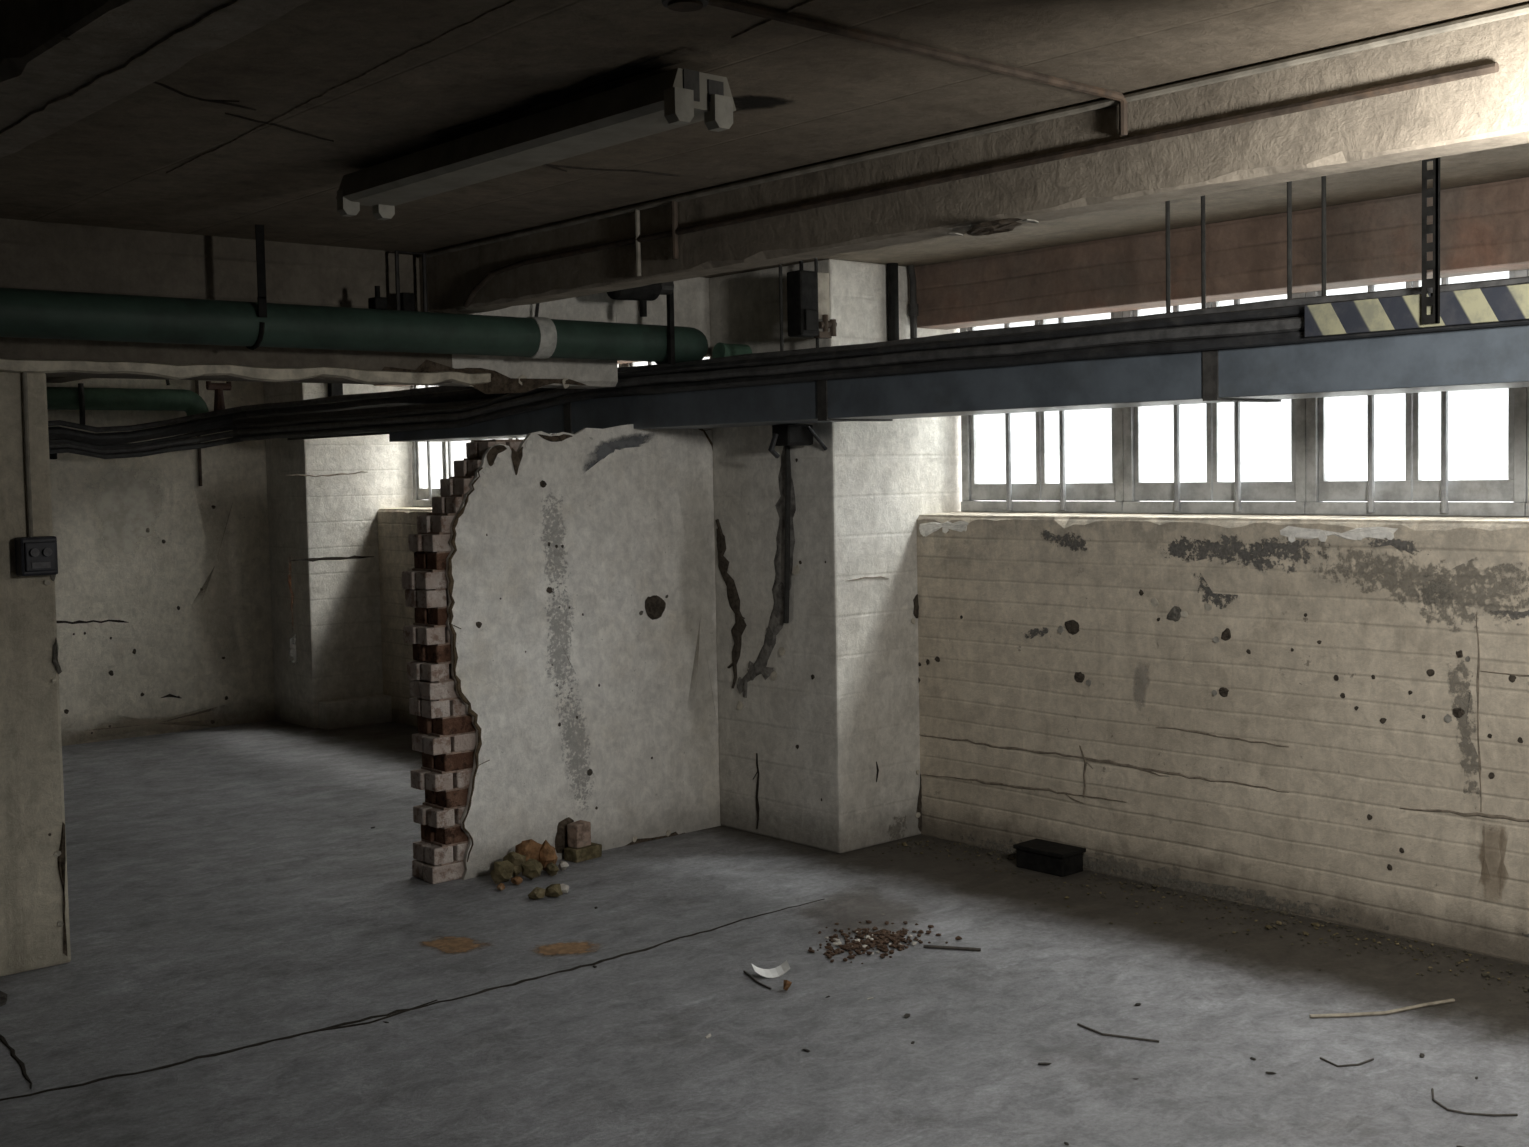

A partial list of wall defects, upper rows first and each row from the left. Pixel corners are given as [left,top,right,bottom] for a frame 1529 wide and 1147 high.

water stain [1163,534,1529,632]
water stain [1448,661,1481,796]